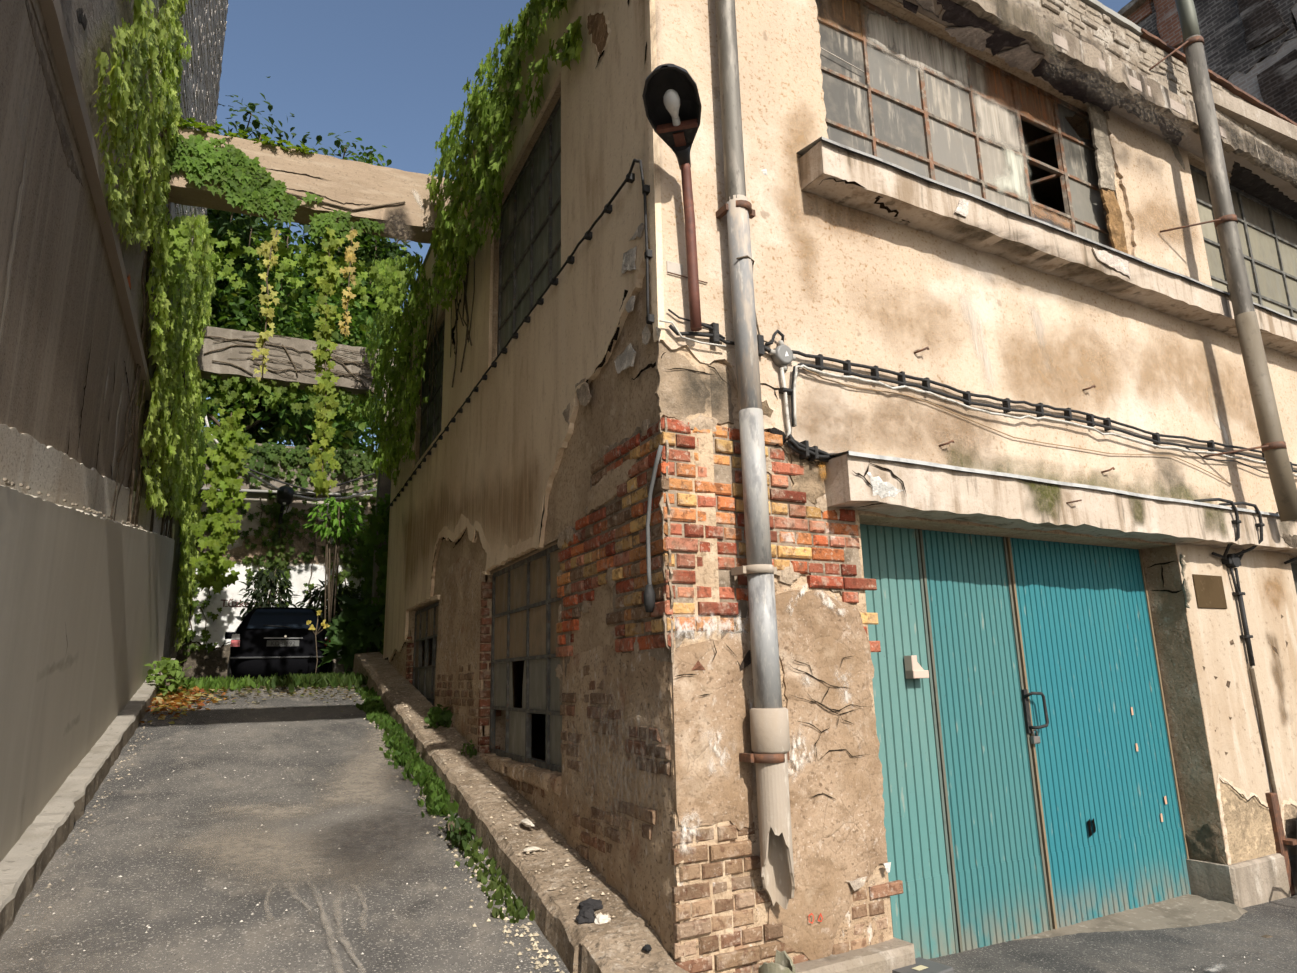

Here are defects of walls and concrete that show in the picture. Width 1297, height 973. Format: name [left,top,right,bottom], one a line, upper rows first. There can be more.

spalling [903,0,1185,278]
crack [819,178,910,223]
damp [956,225,1125,286]
damp [1011,313,1111,397]
damp [1142,347,1250,444]
spalling [761,396,881,652]
crack [853,458,907,507]
damp [1163,463,1183,493]
spalling [435,290,808,973]
crack [670,590,888,960]
spalling [1185,773,1297,865]
corrosion [1265,792,1297,896]